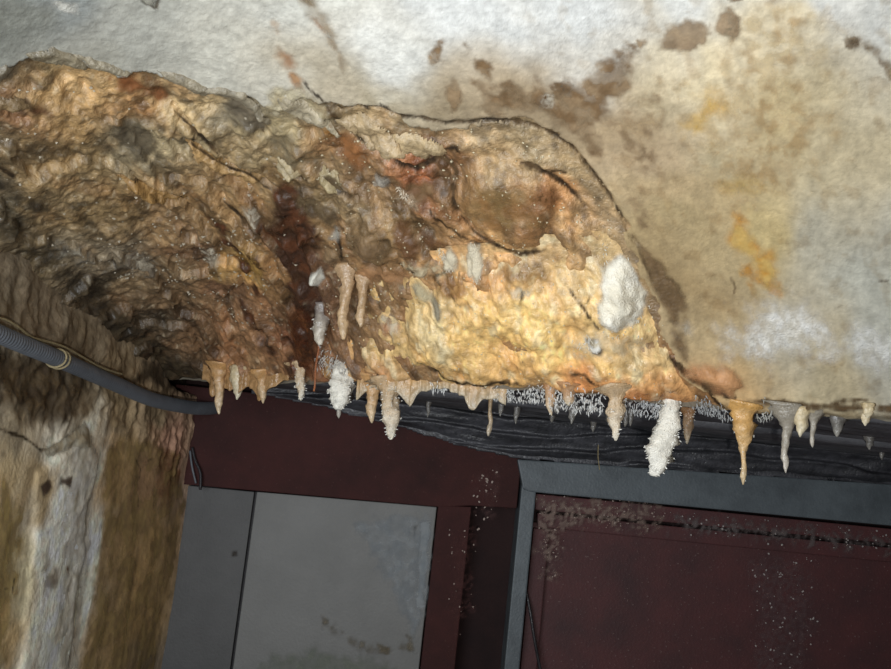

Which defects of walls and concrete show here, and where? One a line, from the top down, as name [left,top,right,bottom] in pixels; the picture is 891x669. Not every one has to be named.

water stain [473,60,491,84]
water stain [488,40,645,133]
water stain [663,0,739,50]
water stain [845,37,873,50]
crack [335,231,343,258]
spalling [0,46,723,408]
corrosion [391,179,434,205]
crack [304,83,622,216]
crack [396,146,539,256]
water stain [268,183,698,402]
corrosion [289,308,323,374]
water stain [41,442,97,669]